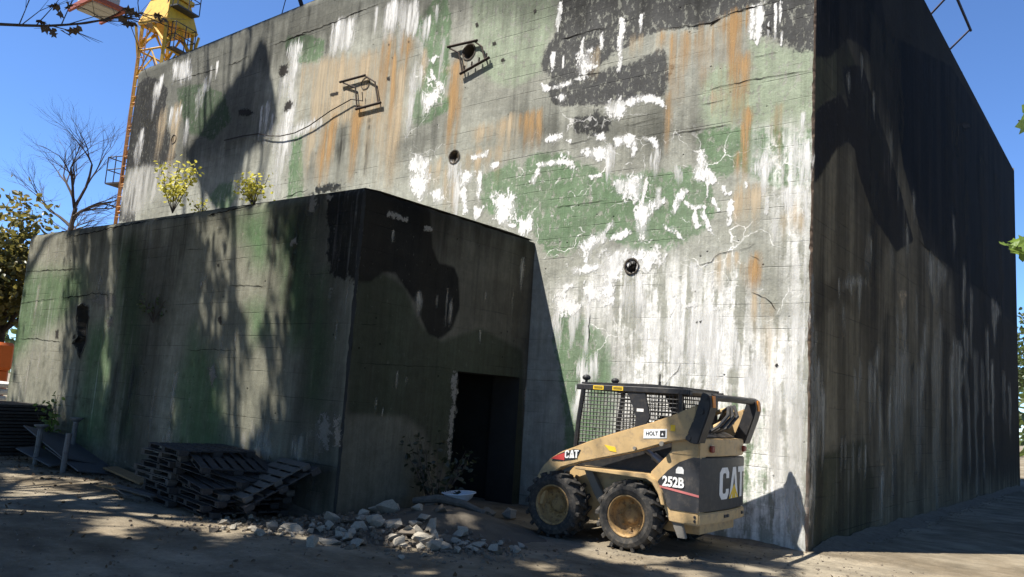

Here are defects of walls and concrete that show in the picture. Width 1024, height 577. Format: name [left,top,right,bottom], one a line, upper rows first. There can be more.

crack [666,1,770,30]
corrosion [301,35,409,170]
leakage [449,162,461,209]
leakage [606,145,615,176]
spalling [72,303,90,360]
leakage [859,315,971,436]
spalling [447,371,459,460]